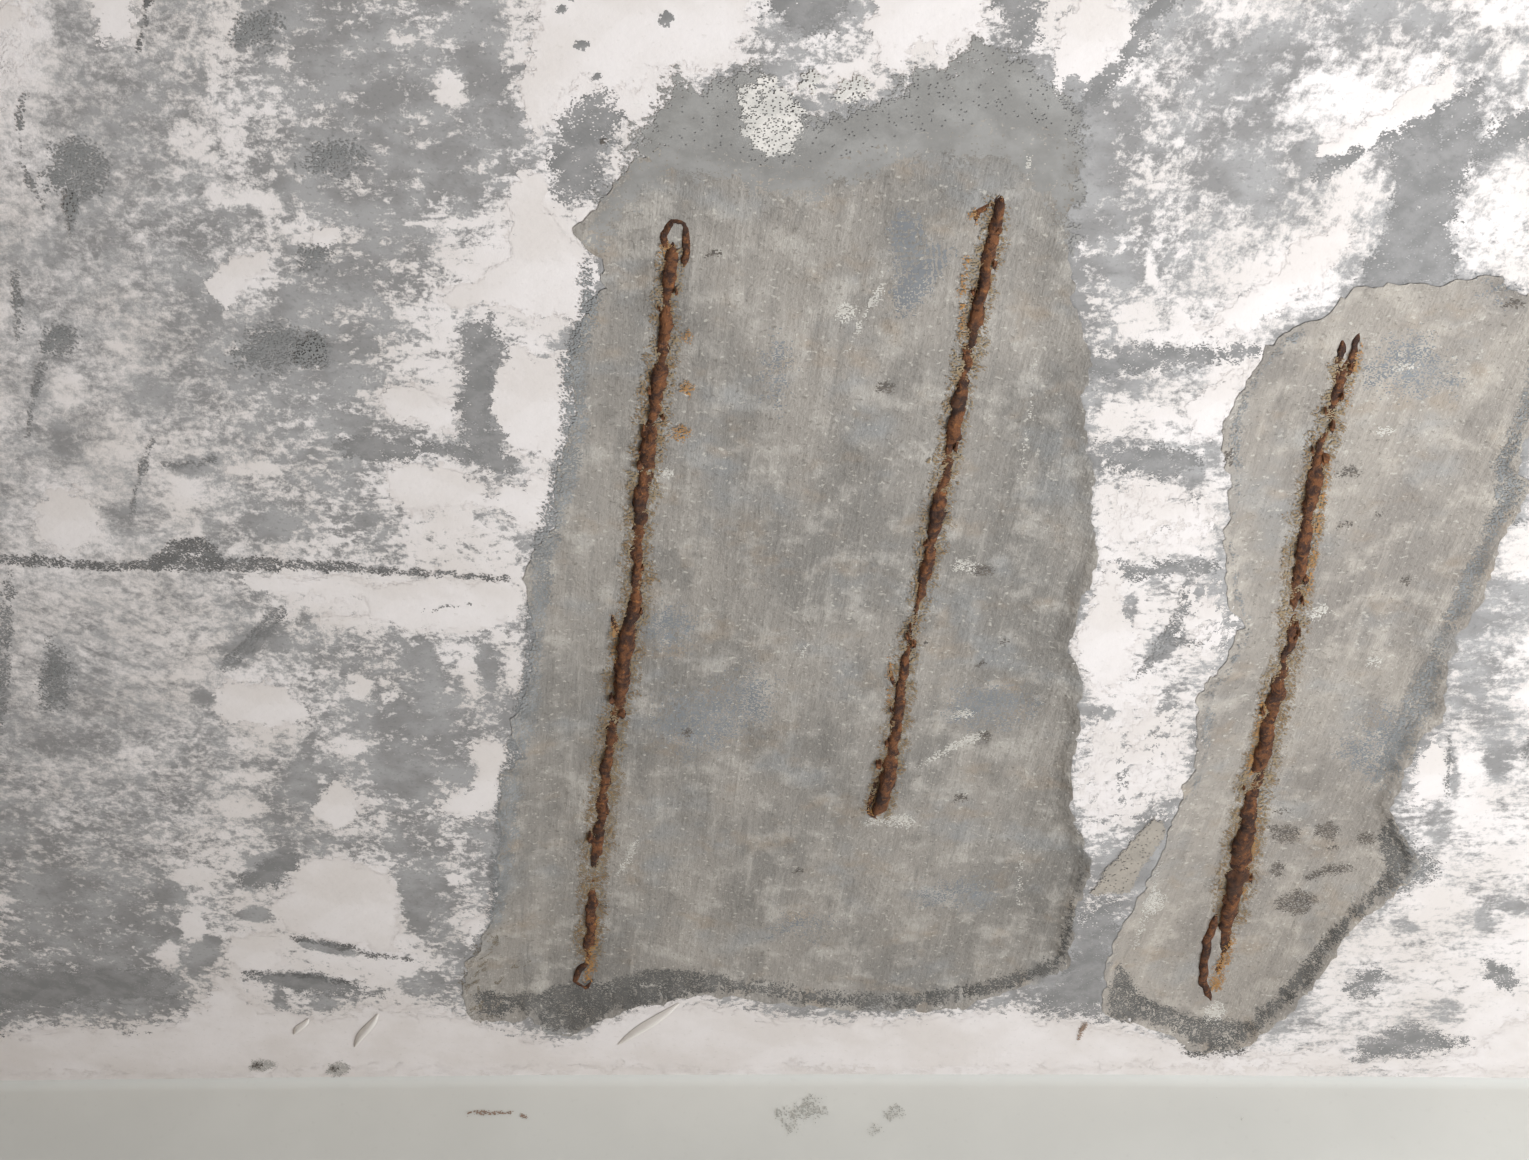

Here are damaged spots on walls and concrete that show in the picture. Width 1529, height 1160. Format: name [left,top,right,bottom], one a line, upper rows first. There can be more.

peeling [516,0,758,142]
peeling [862,0,991,71]
peeling [374,311,508,456]
crack [0,537,511,735]
rust [568,241,695,983]
rust [860,195,1011,820]
peeling [1114,549,1222,585]
rust [1208,342,1364,992]
peeling [1078,691,1192,832]
peeling [232,850,404,955]
peeling [1349,1012,1529,1078]
peeling [1480,958,1521,996]